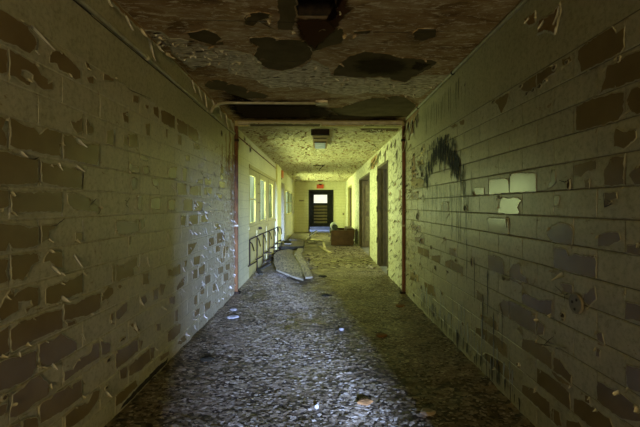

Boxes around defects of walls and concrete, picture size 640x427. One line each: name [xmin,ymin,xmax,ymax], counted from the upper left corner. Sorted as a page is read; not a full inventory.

peeling [0,8,118,91]
peeling [524,2,563,36]
peeling [107,0,463,297]
water stain [421,134,472,248]
peeling [472,172,537,235]
peeling [565,26,640,209]
peeling [0,117,236,427]
peeling [516,338,640,427]